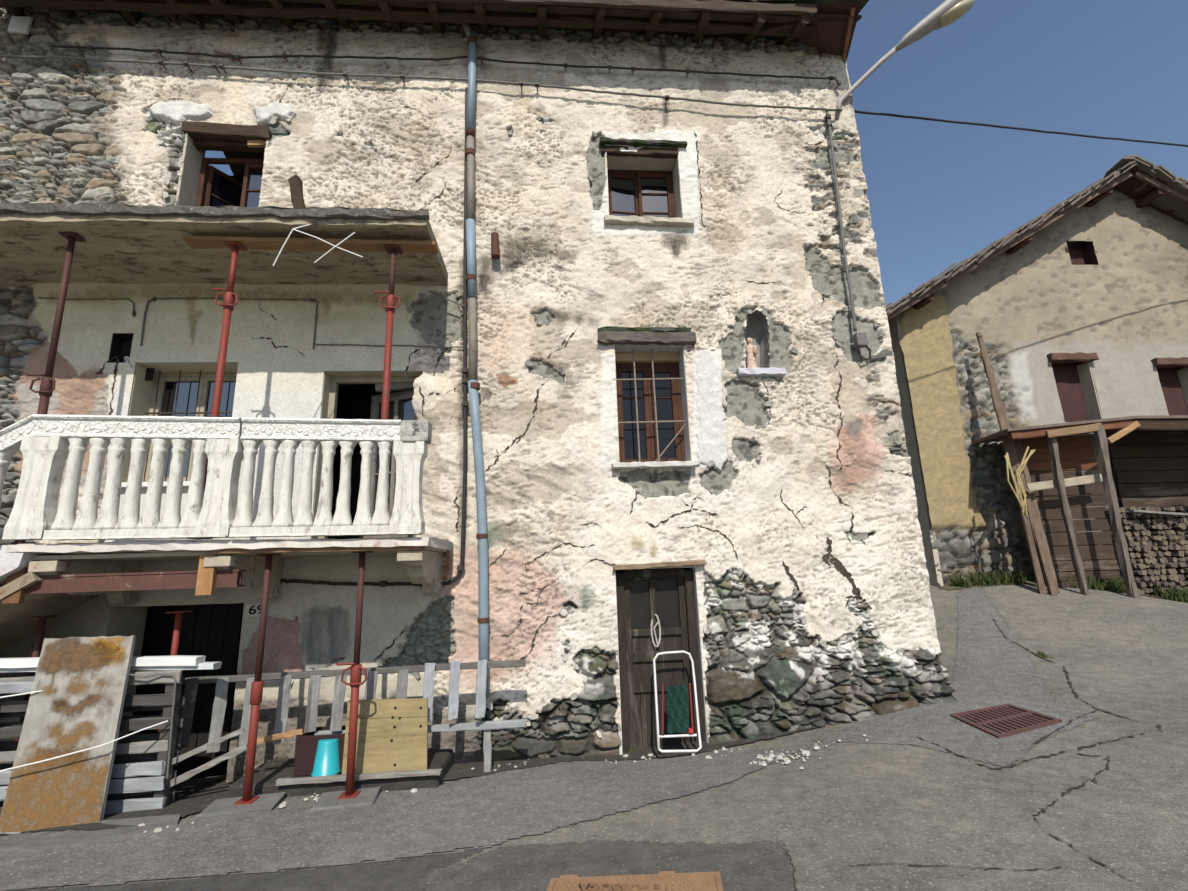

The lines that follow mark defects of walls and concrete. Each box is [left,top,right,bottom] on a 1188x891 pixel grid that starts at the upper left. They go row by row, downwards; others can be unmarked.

spalling [144,101,214,207]
spalling [406,292,462,352]
spalling [805,246,882,365]
crack [94,354,132,415]
crack [486,330,576,471]
peeling [618,307,798,499]
crack [630,492,738,560]
crack [780,355,872,609]
spalling [377,595,456,679]
crack [488,523,616,660]
crack [782,561,802,628]
spalling [703,568,958,744]